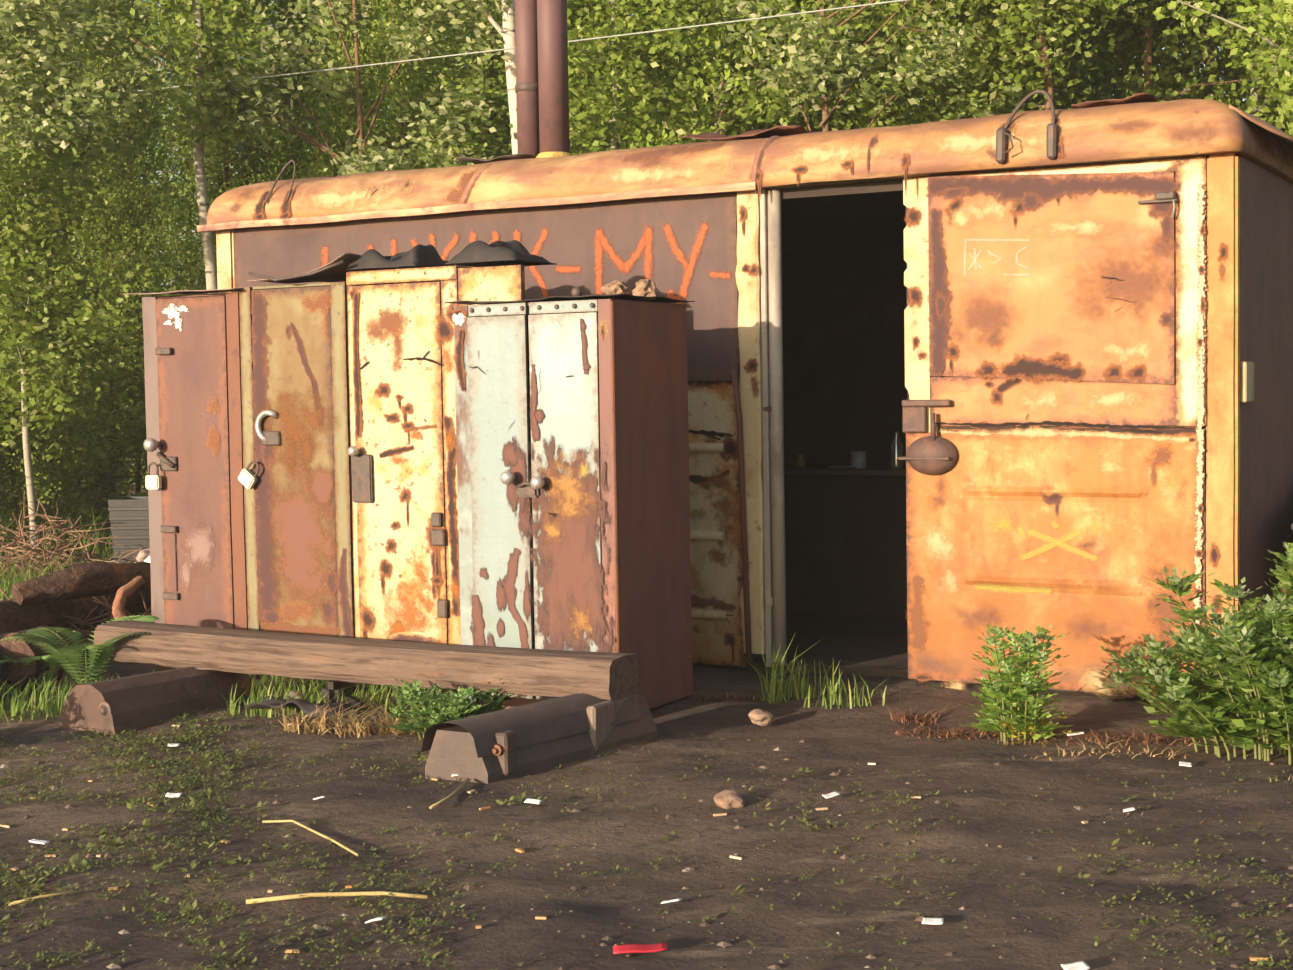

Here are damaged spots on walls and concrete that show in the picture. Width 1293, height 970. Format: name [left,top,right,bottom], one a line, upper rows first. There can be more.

corrosion [841,135,877,175]
corrosion [231,190,294,220]
corrosion [900,119,1180,376]
corrosion [435,303,466,391]
peeling [580,319,590,374]
corrosion [975,352,1085,405]
peeling [938,184,1207,624]
corrosion [1103,364,1146,382]
corrosion [251,289,460,639]
peeling [470,364,617,653]
corrosion [1042,493,1063,515]
corrosion [1146,564,1195,656]